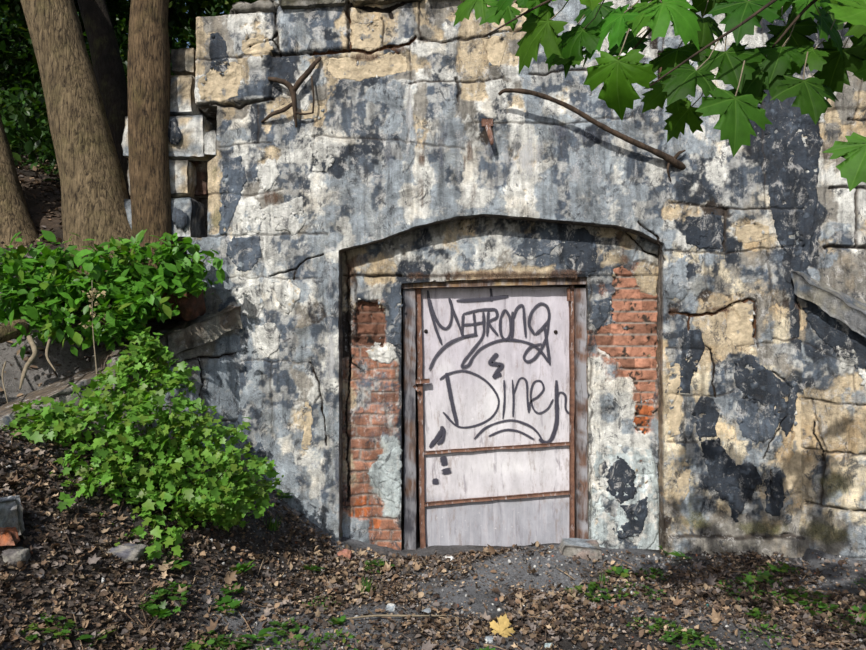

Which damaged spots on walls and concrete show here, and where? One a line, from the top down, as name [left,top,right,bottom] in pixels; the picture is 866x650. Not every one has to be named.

peeling [736,90,823,286]
crack [270,253,324,280]
peeling [685,212,724,250]
spalling [356,284,403,364]
spalling [591,256,691,435]
crack [312,271,361,501]
flaking render [367,445,403,508]
peeling [667,301,805,522]
crack [813,421,825,462]